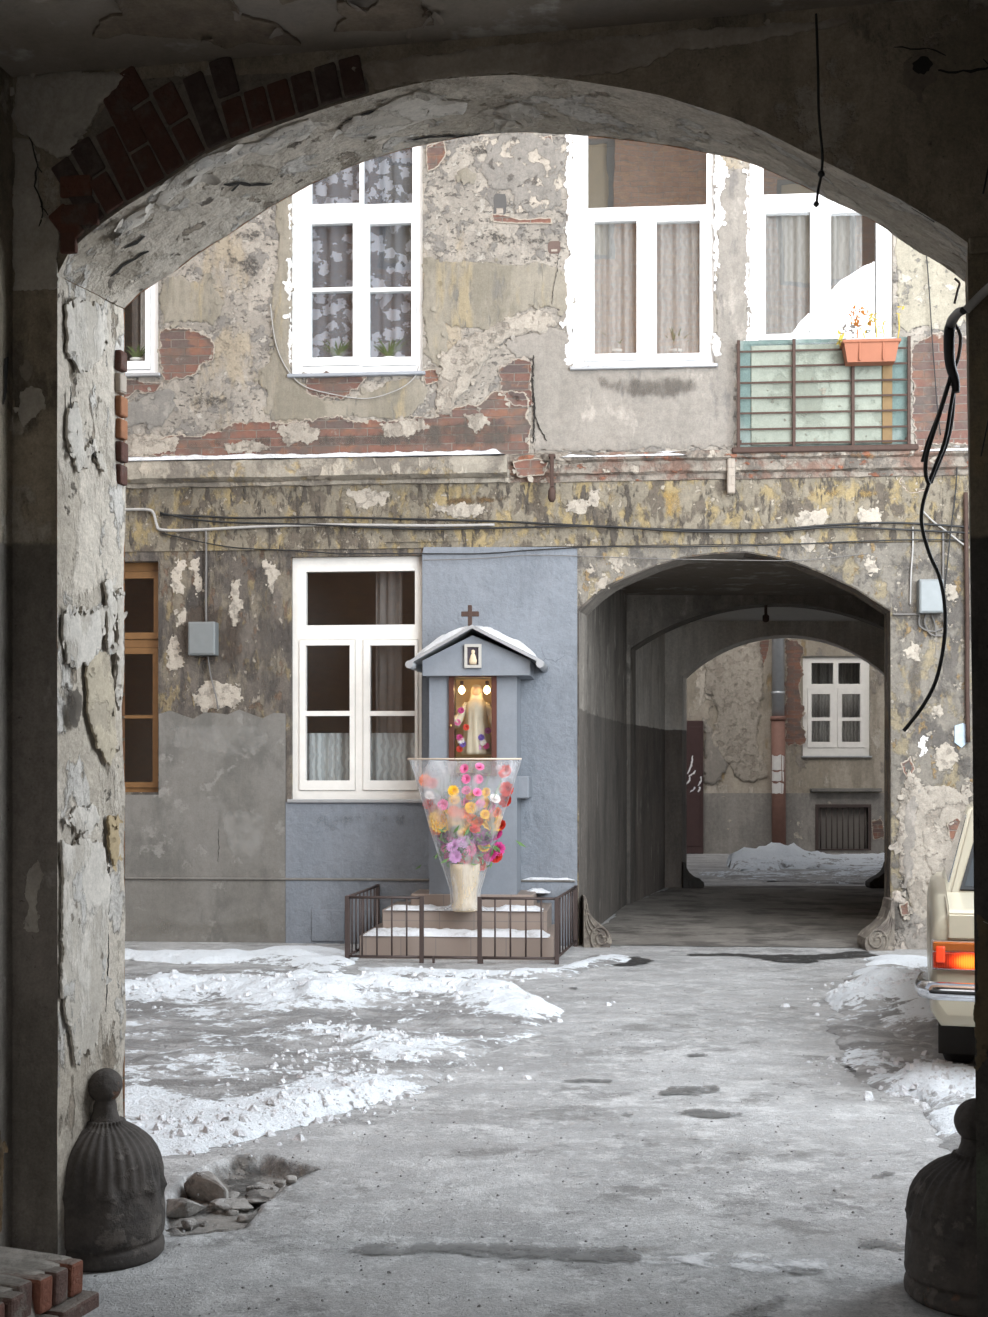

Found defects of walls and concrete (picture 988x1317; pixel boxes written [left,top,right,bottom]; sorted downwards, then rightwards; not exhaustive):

crack [29,137,48,226]
flaking render [10,0,848,291]
peeling [64,166,753,486]
peeling [61,577,128,766]
peeling [166,557,205,677]
leakage [183,605,240,662]
peeling [192,680,244,713]
peeling [228,579,243,626]
leakage [259,569,274,690]
peeling [261,557,280,594]
flaking render [871,735,973,950]
peeling [59,804,123,1066]